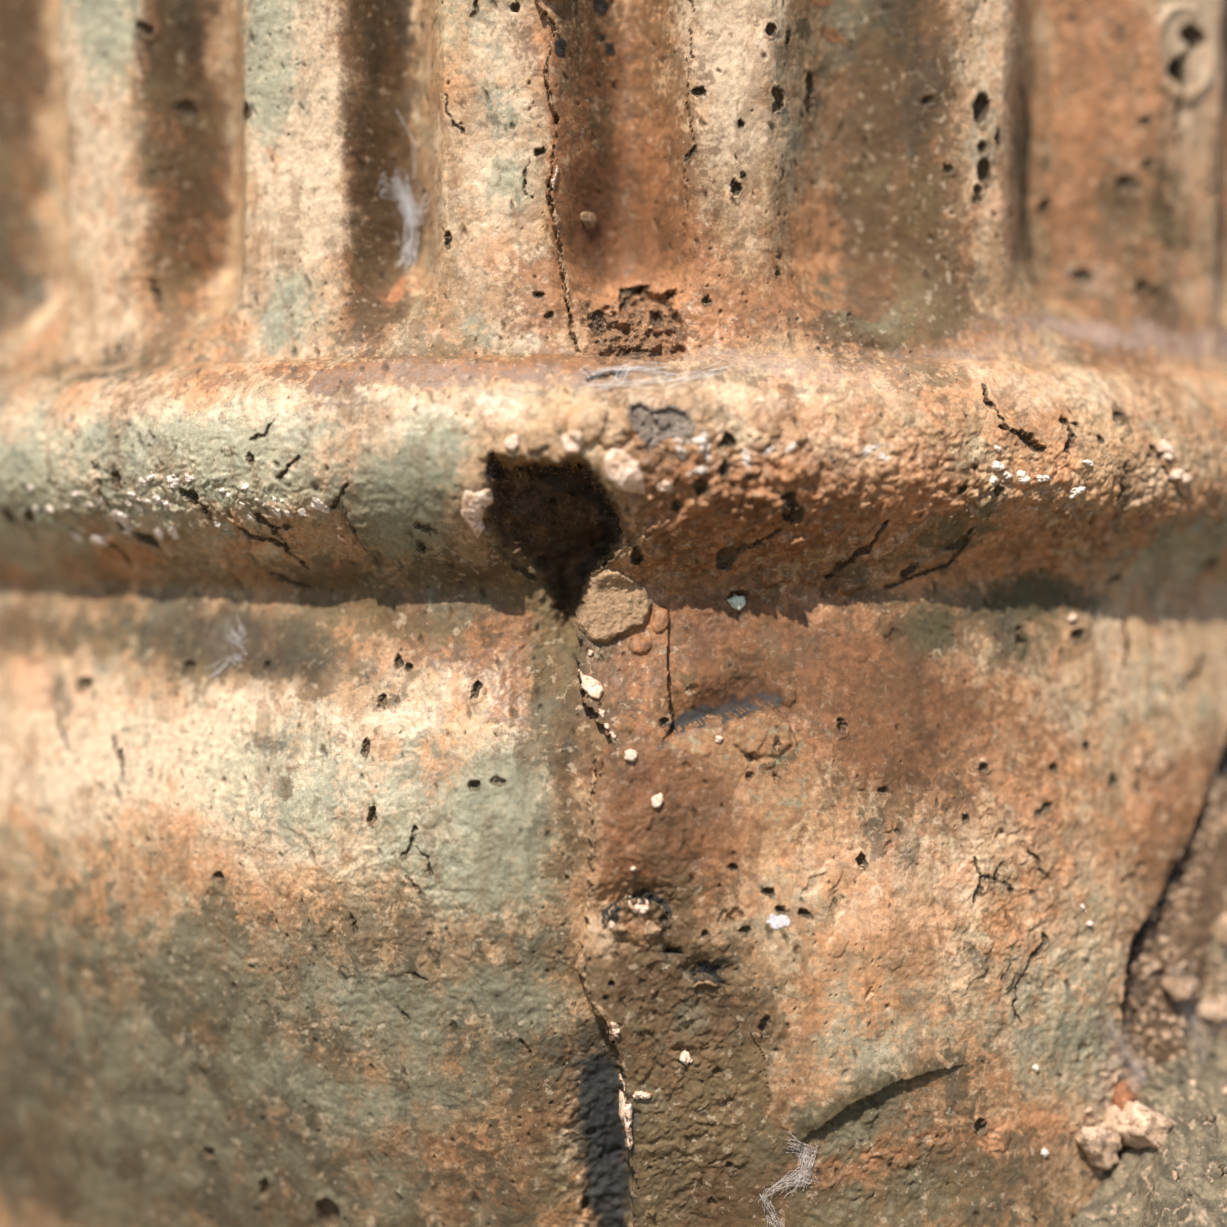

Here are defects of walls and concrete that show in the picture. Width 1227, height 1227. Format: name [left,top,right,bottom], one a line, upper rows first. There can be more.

crack [522,145,555,208]
crack [559,245,578,348]
spalling [549,166,690,381]
spalling [628,402,800,496]
crack [982,384,1079,454]
spalling [461,431,683,656]
crack [736,529,783,554]
crack [824,520,889,579]
crack [884,526,977,589]
peeling [724,590,749,611]
spalling [470,680,483,699]
peeling [578,667,616,739]